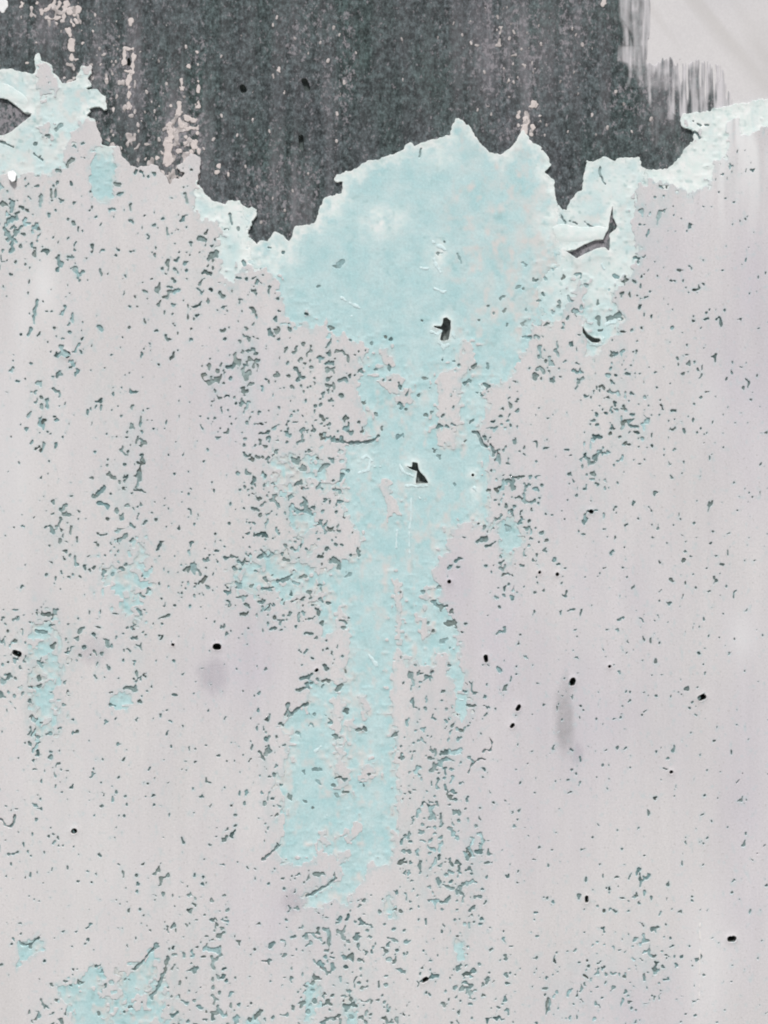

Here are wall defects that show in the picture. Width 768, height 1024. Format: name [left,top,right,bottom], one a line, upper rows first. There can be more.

peeling [669,309,726,379]
peeling [86,387,139,417]
peeling [578,500,625,556]
peeling [636,531,737,623]
spalling [482,634,533,696]
spalling [595,679,706,725]
peeling [5,795,79,877]
peeling [89,758,128,838]
peeling [208,789,249,846]
peeling [577,855,653,913]
peeling [11,923,94,968]
peeling [532,881,708,1024]